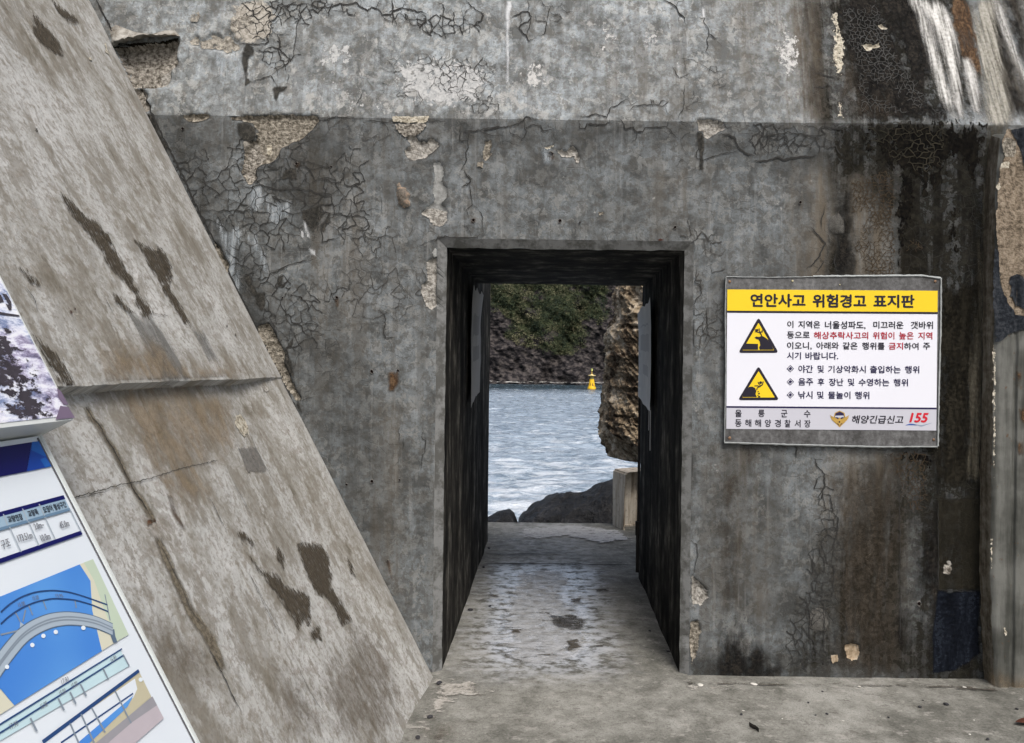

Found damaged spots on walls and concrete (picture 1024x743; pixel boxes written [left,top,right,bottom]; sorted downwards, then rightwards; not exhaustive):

spalling [109,0,276,112]
water stain [61,192,187,384]
water stain [134,240,215,357]
flaking render [231,114,319,184]
flaking render [392,116,448,227]
flaking render [421,248,437,310]
crack [173,0,948,373]
water stain [831,0,1024,485]
peeling [996,129,1024,316]
water stain [238,531,352,641]
crack [785,447,848,673]
flaking render [831,643,860,663]